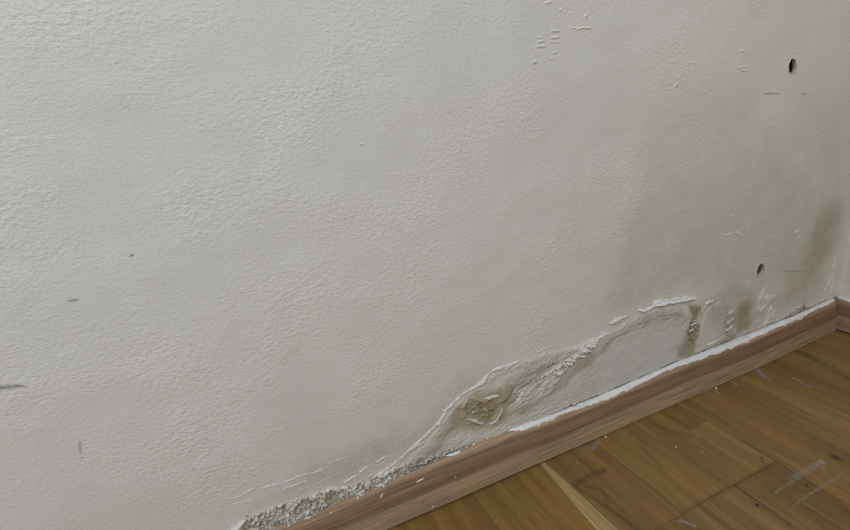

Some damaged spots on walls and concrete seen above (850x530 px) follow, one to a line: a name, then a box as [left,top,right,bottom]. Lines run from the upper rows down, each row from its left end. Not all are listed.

spalling [721,305,737,343]
peeling [749,286,834,330]
flaking render [230,295,701,530]